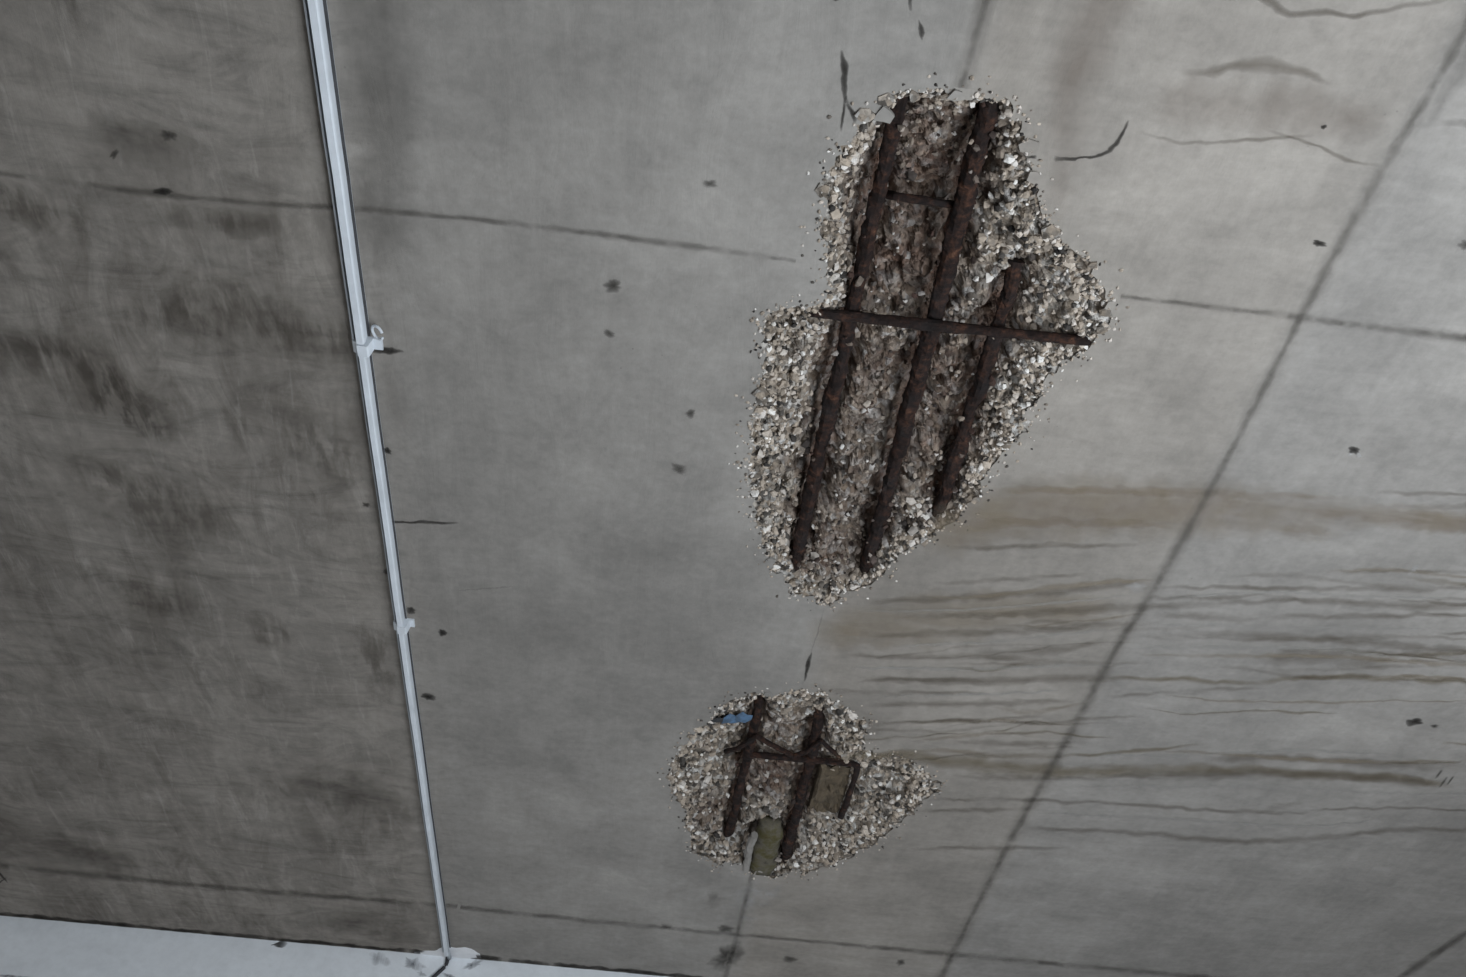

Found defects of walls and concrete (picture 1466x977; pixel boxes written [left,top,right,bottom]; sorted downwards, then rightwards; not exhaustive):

spalling [728,72,1130,612]
spalling [657,682,947,883]